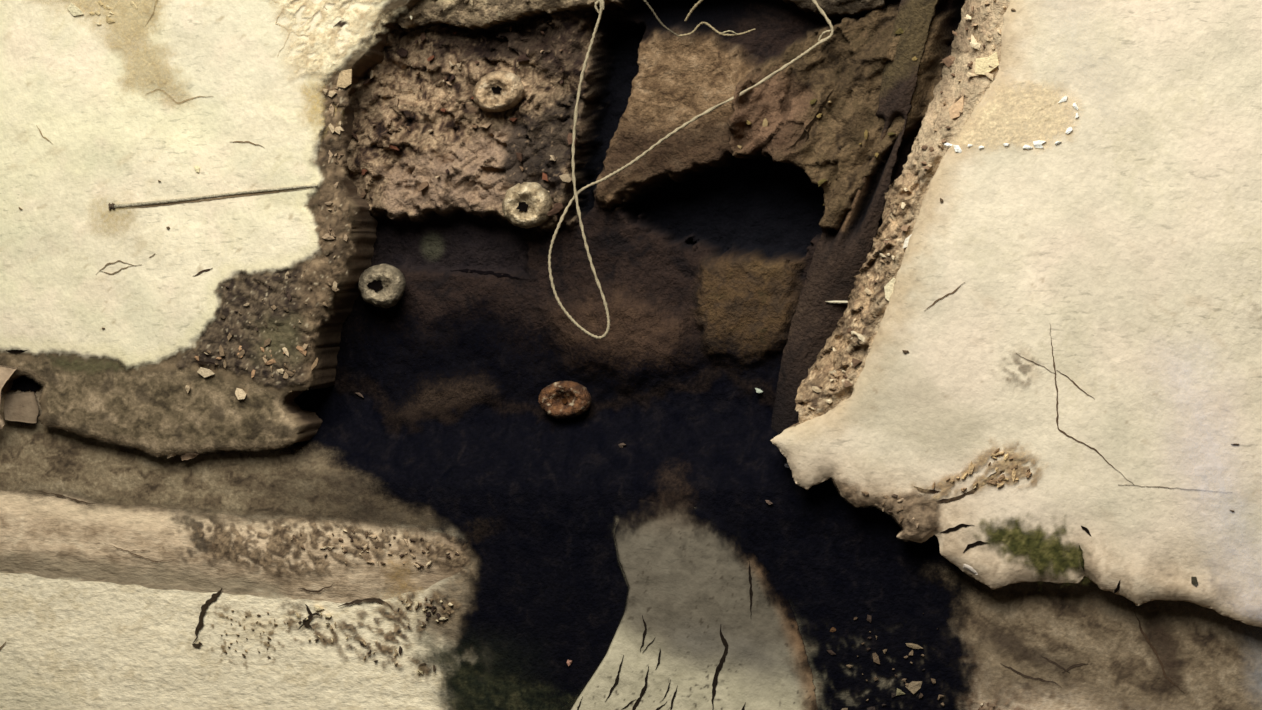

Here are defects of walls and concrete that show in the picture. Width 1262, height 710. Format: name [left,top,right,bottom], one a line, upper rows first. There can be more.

spalling [176,0,1079,426]
peeling [0,365,19,429]
crack [1016,325,1227,493]
peeling [192,588,461,676]
peeling [186,515,473,578]
crack [577,615,678,710]
damp [0,299,1262,710]
crack [711,625,746,710]
crack [746,562,754,617]
spalling [834,447,1040,541]